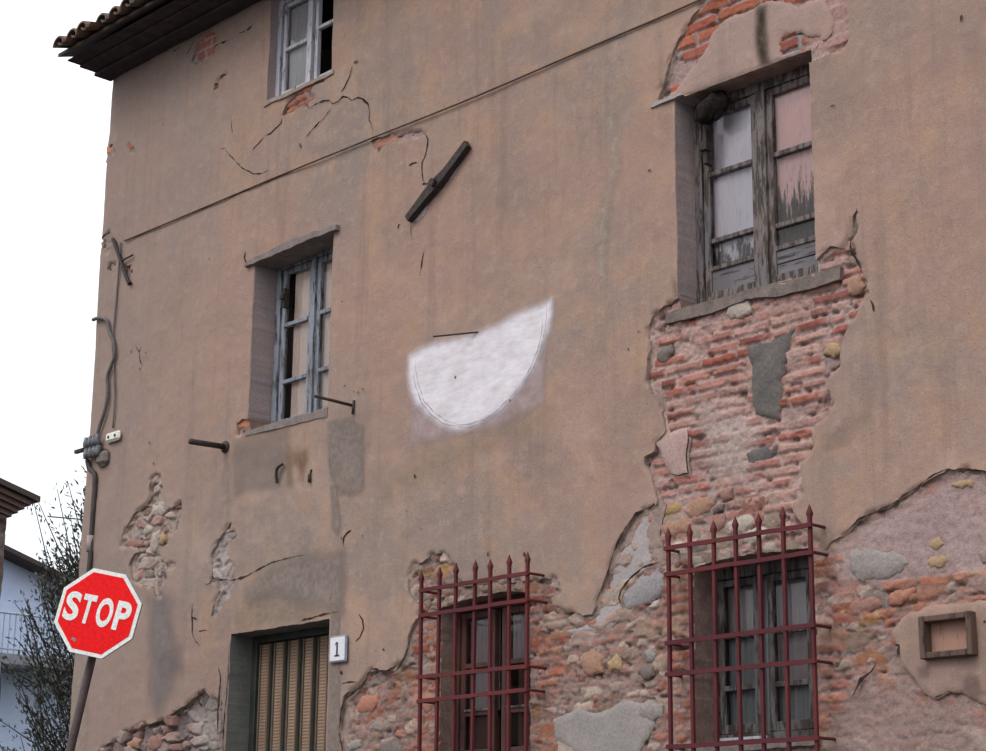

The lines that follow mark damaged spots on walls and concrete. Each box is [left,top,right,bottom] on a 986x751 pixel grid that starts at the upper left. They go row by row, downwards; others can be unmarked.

spalling [662,0,849,104]
leakage [757,8,767,63]
crack [304,67,373,138]
crack [221,117,282,174]
crack [409,134,428,185]
spalling [342,212,986,751]
spalling [122,462,182,597]
spalling [212,526,236,615]
spalling [100,691,223,751]